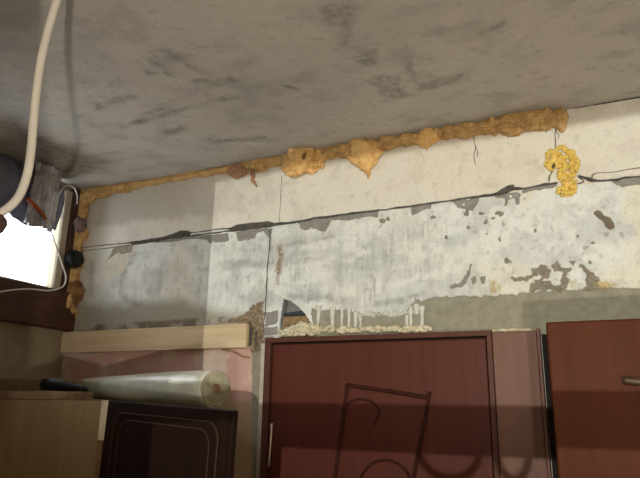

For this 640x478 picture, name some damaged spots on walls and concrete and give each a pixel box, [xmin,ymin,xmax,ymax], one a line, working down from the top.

crack [577,167,640,185]
peeling [298,211,390,231]
peeling [411,204,435,218]
peeling [452,184,556,224]
spalling [594,210,614,229]
crack [83,163,558,337]
spalling [224,260,640,352]